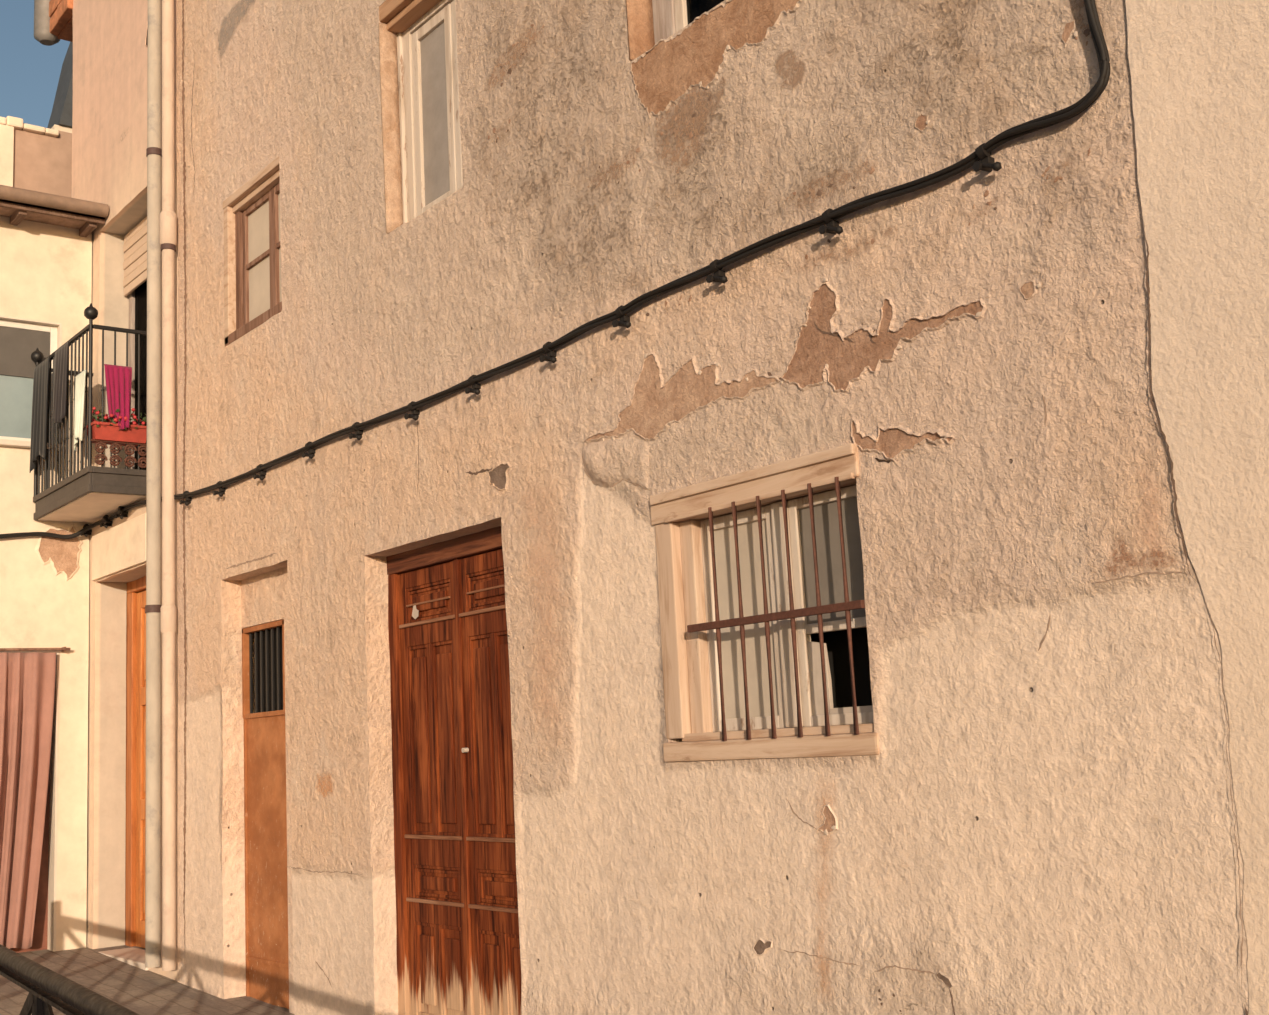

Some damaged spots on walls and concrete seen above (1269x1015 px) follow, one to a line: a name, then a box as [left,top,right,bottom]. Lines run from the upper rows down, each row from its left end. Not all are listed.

spalling [630,0,803,135]
leakage [776,50,803,88]
peeling [584,278,987,443]
peeling [850,417,956,463]
spalling [465,461,512,492]
peeling [34,524,83,581]
crack [1143,221,1248,1015]
spalling [816,804,838,836]
crack [777,948,955,1015]